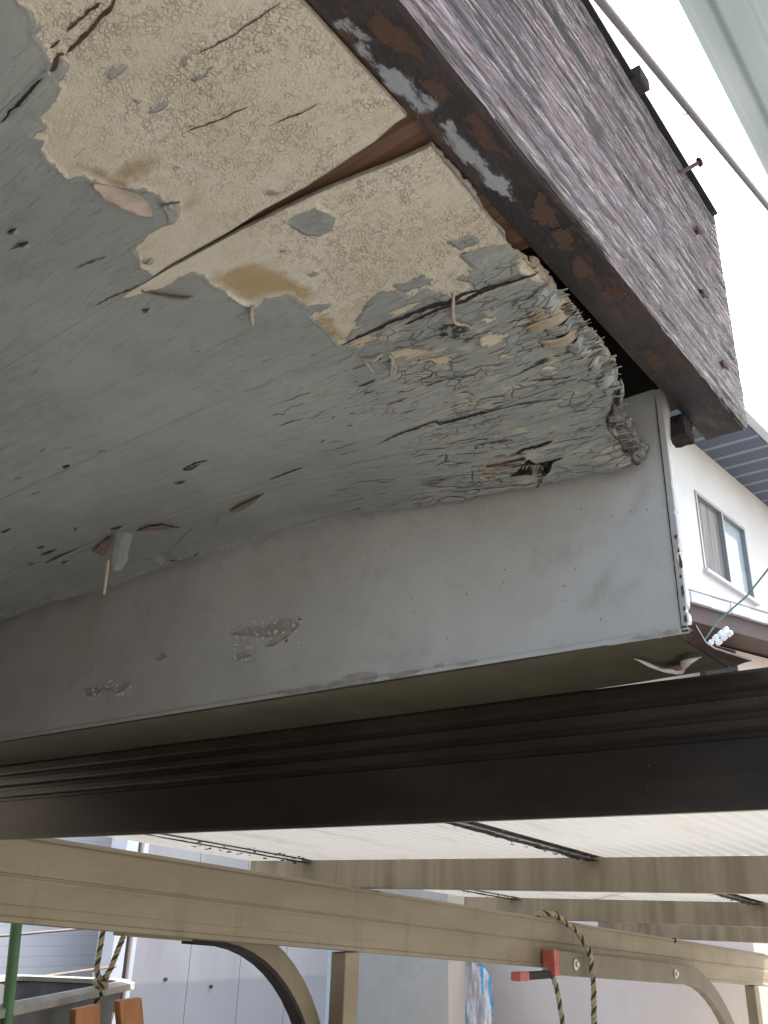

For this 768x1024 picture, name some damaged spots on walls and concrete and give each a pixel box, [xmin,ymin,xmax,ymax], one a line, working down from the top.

crack [0,0,116,124]
crack [195,2,280,56]
crack [189,107,247,131]
crack [270,104,317,126]
peeling [17,0,513,349]
peeling [528,192,599,279]
crack [339,271,543,348]
peeling [479,317,516,360]
peeling [511,257,604,372]
crack [275,316,593,510]
peeling [481,454,526,479]
peeling [226,617,303,661]